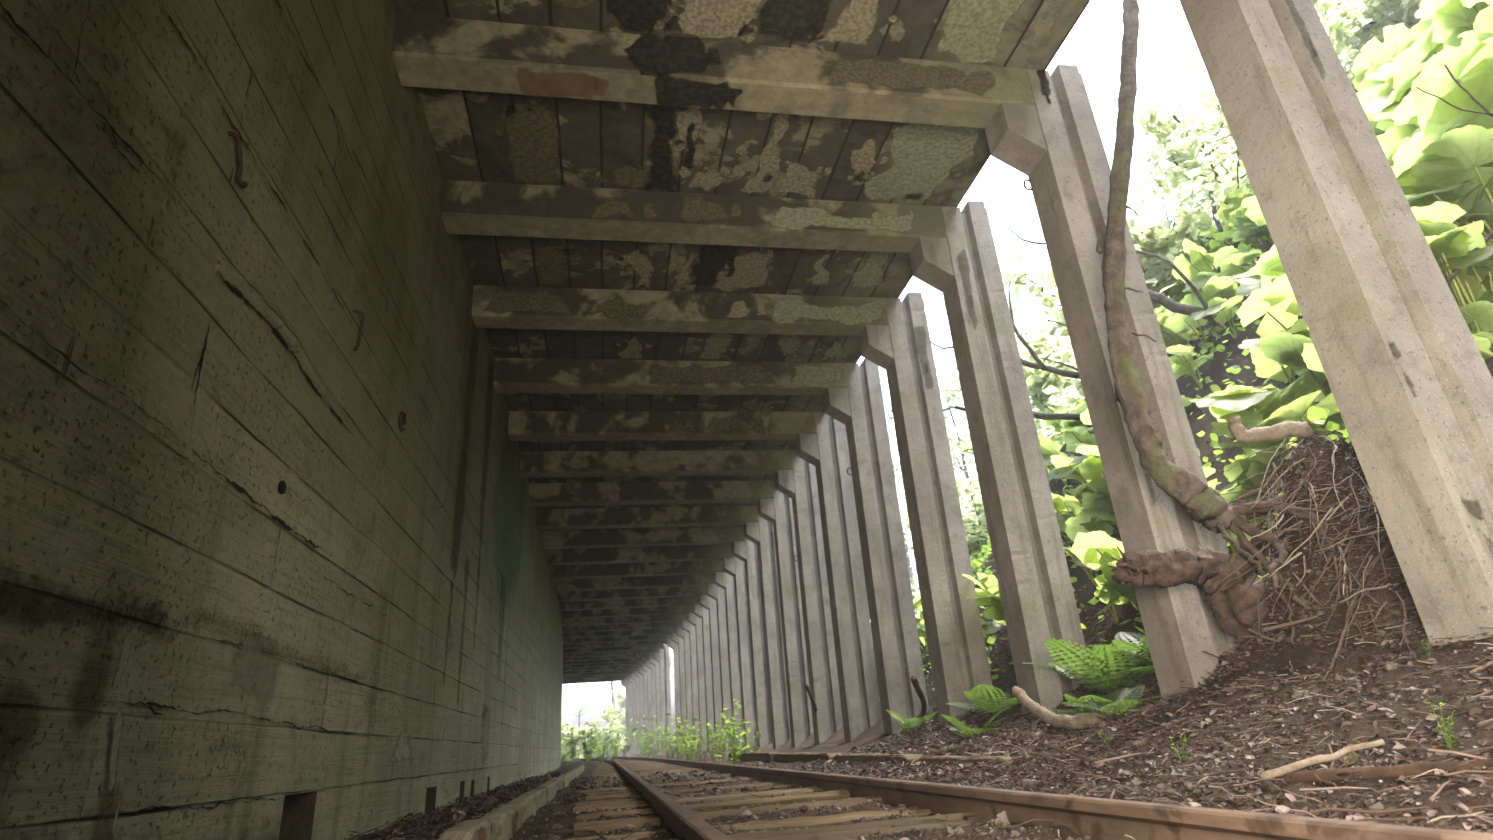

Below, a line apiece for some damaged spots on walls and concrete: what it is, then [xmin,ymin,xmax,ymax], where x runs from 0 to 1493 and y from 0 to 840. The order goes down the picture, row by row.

peeling [654,0,763,43]
crack [0,300,387,616]